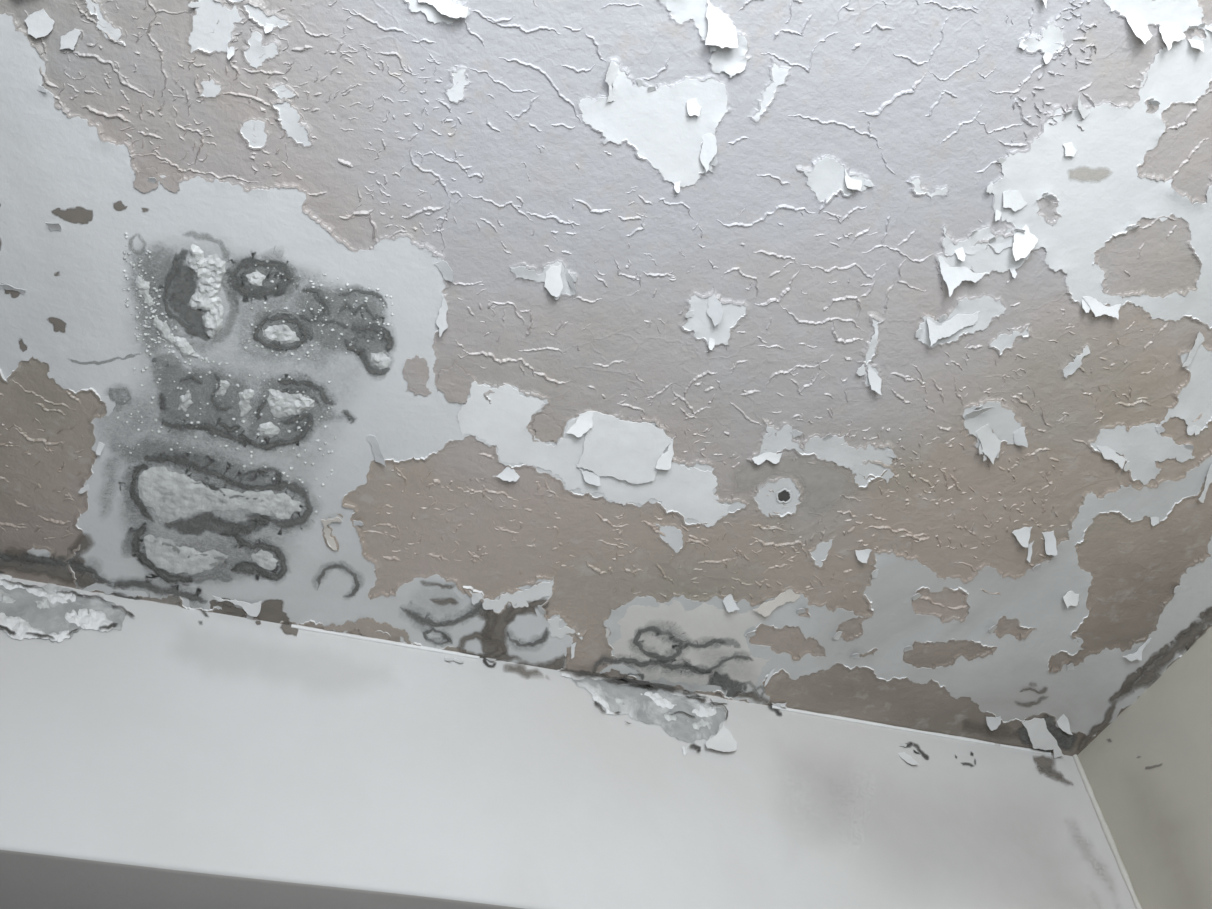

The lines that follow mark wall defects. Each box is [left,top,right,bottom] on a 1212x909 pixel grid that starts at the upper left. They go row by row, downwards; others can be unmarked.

peeling [795,152,875,207]
peeling [913,0,1212,350]
leakage [0,232,393,636]
peeling [0,0,806,671]
crack [24,0,1168,610]
peeling [856,311,885,395]
peeling [987,321,1034,357]
leakage [405,583,565,677]
leakage [594,627,769,703]
peeling [561,331,1212,758]
spalling [897,742,929,765]
leakage [964,607,1212,784]